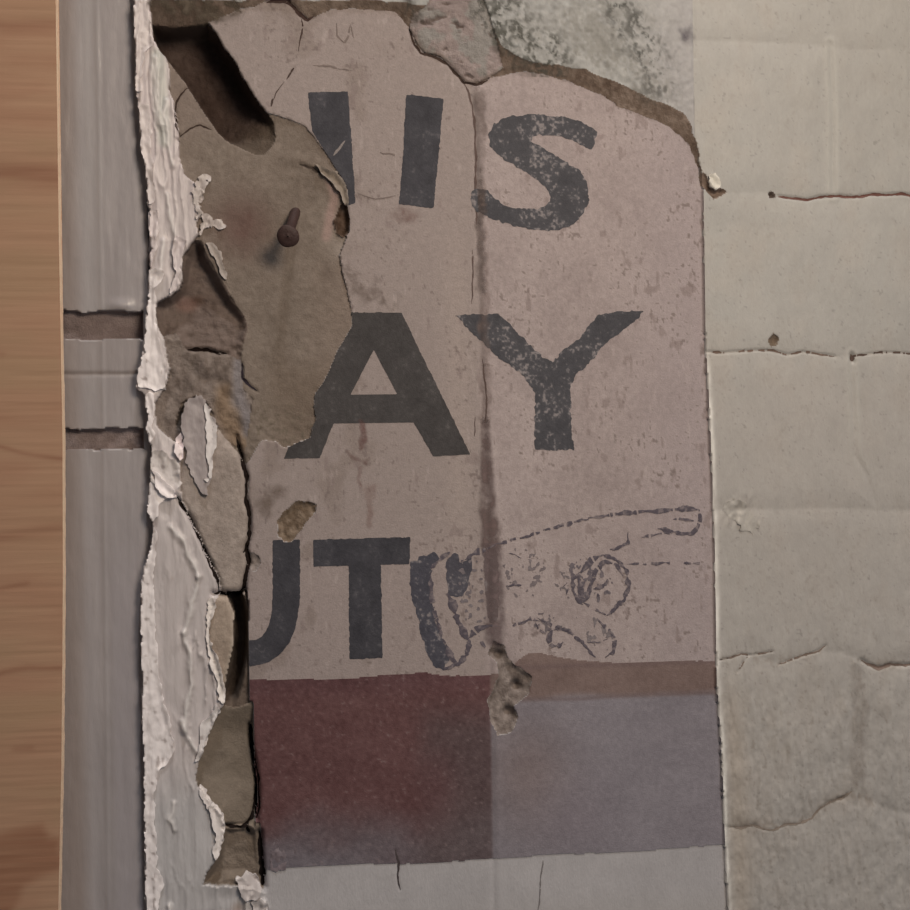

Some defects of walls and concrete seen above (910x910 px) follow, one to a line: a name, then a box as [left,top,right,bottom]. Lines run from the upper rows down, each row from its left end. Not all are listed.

flaking render [291,0,461,78]
flaking render [472,35,726,199]
crack [779,192,910,201]
crack [713,349,910,361]
flaking render [133,0,353,910]
water stain [480,420,503,646]
crack [720,645,826,669]
crack [862,660,910,671]
crack [731,791,852,831]